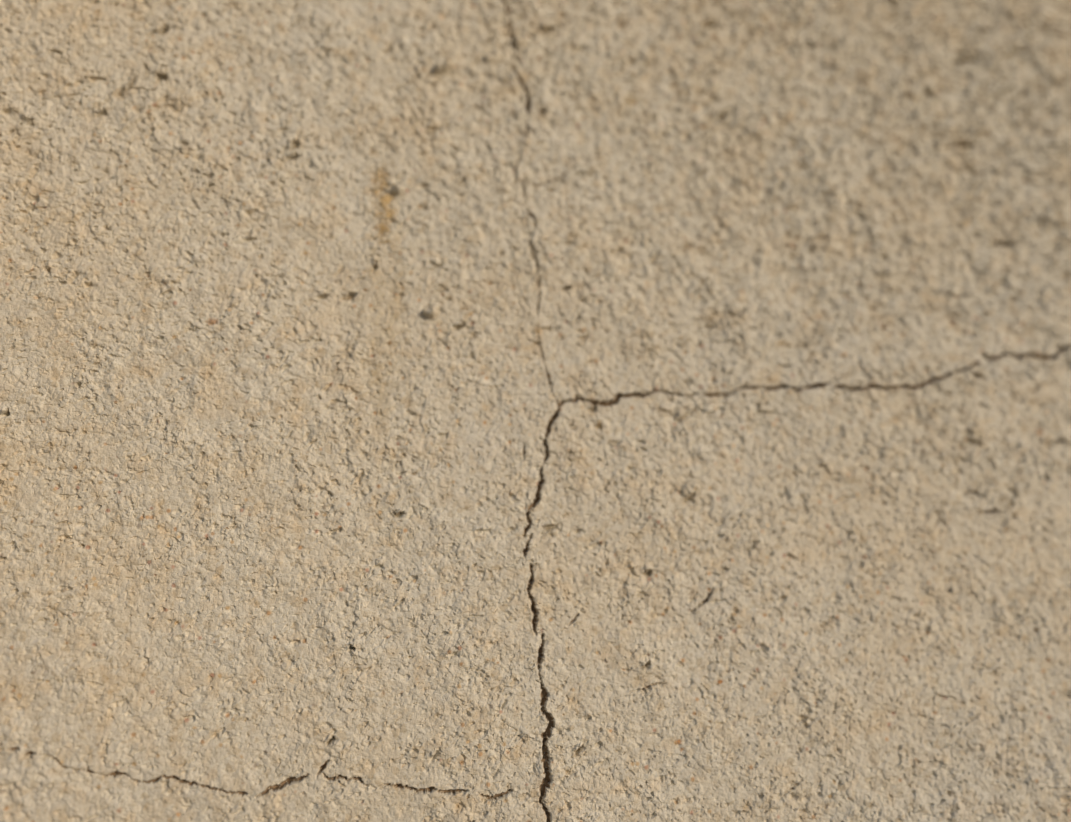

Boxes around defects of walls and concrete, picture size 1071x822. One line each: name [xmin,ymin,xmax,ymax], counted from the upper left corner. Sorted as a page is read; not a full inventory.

crack [491,0,531,138]
crack [514,163,563,309]
crack [523,346,1071,822]
crack [11,747,511,799]